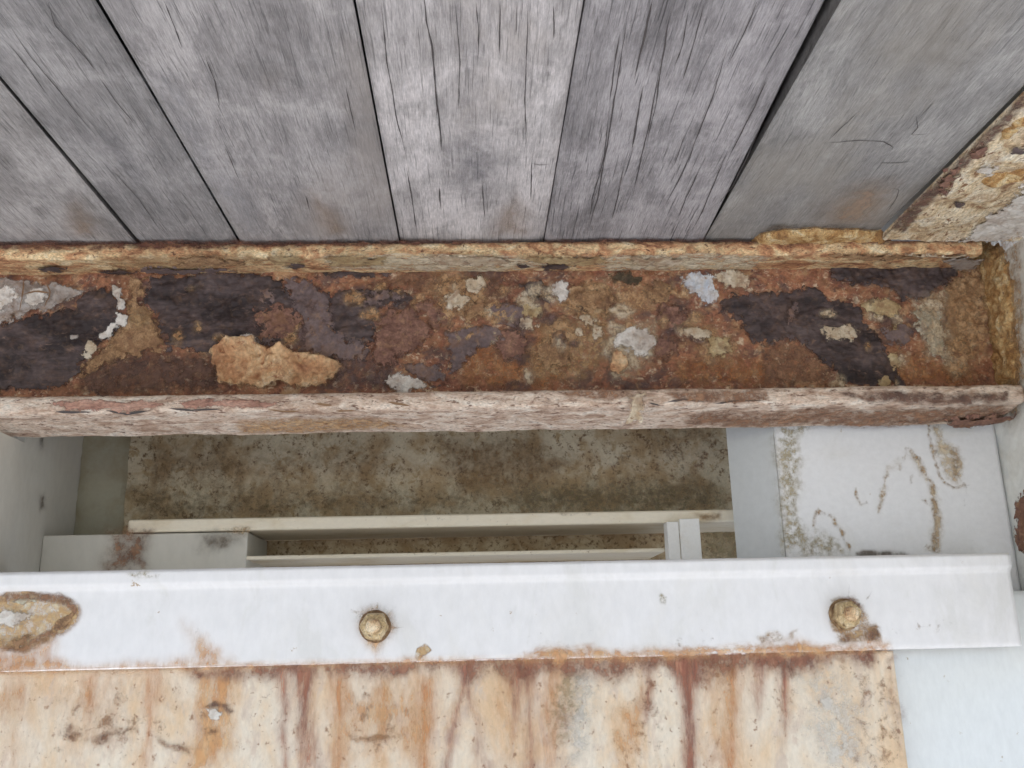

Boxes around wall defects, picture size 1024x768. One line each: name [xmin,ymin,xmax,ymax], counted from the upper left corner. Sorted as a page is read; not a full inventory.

rust [718,96,1024,245]
spalling [0,276,128,391]
rust [0,240,483,250]
rust [53,273,737,434]
spalling [106,184,1024,392]
rust [667,232,1024,429]
leakage [780,426,841,551]
rust [0,648,75,674]
rust [95,716,136,744]
rust [161,644,311,768]
rust [325,599,886,768]